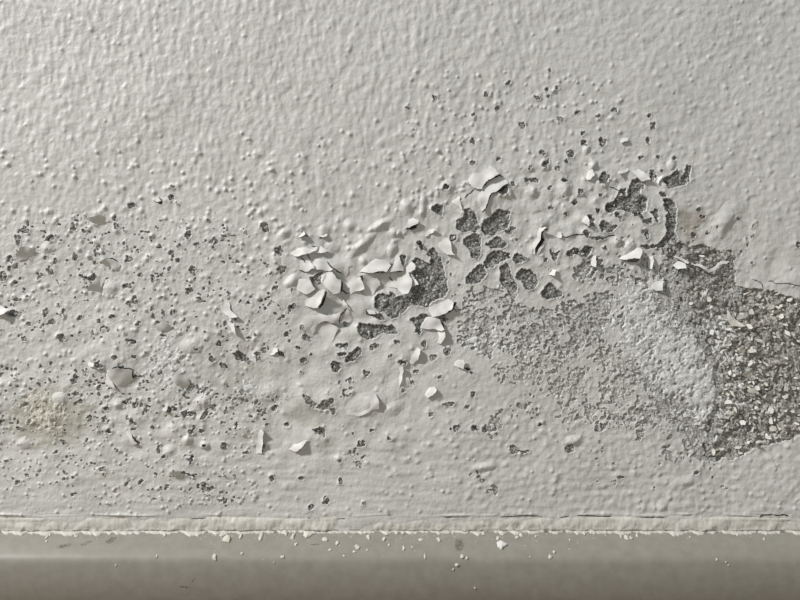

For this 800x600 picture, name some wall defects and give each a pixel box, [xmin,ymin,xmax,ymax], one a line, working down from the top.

flaking render [0,150,800,478]
peeling [46,421,106,496]
peeling [125,455,243,507]